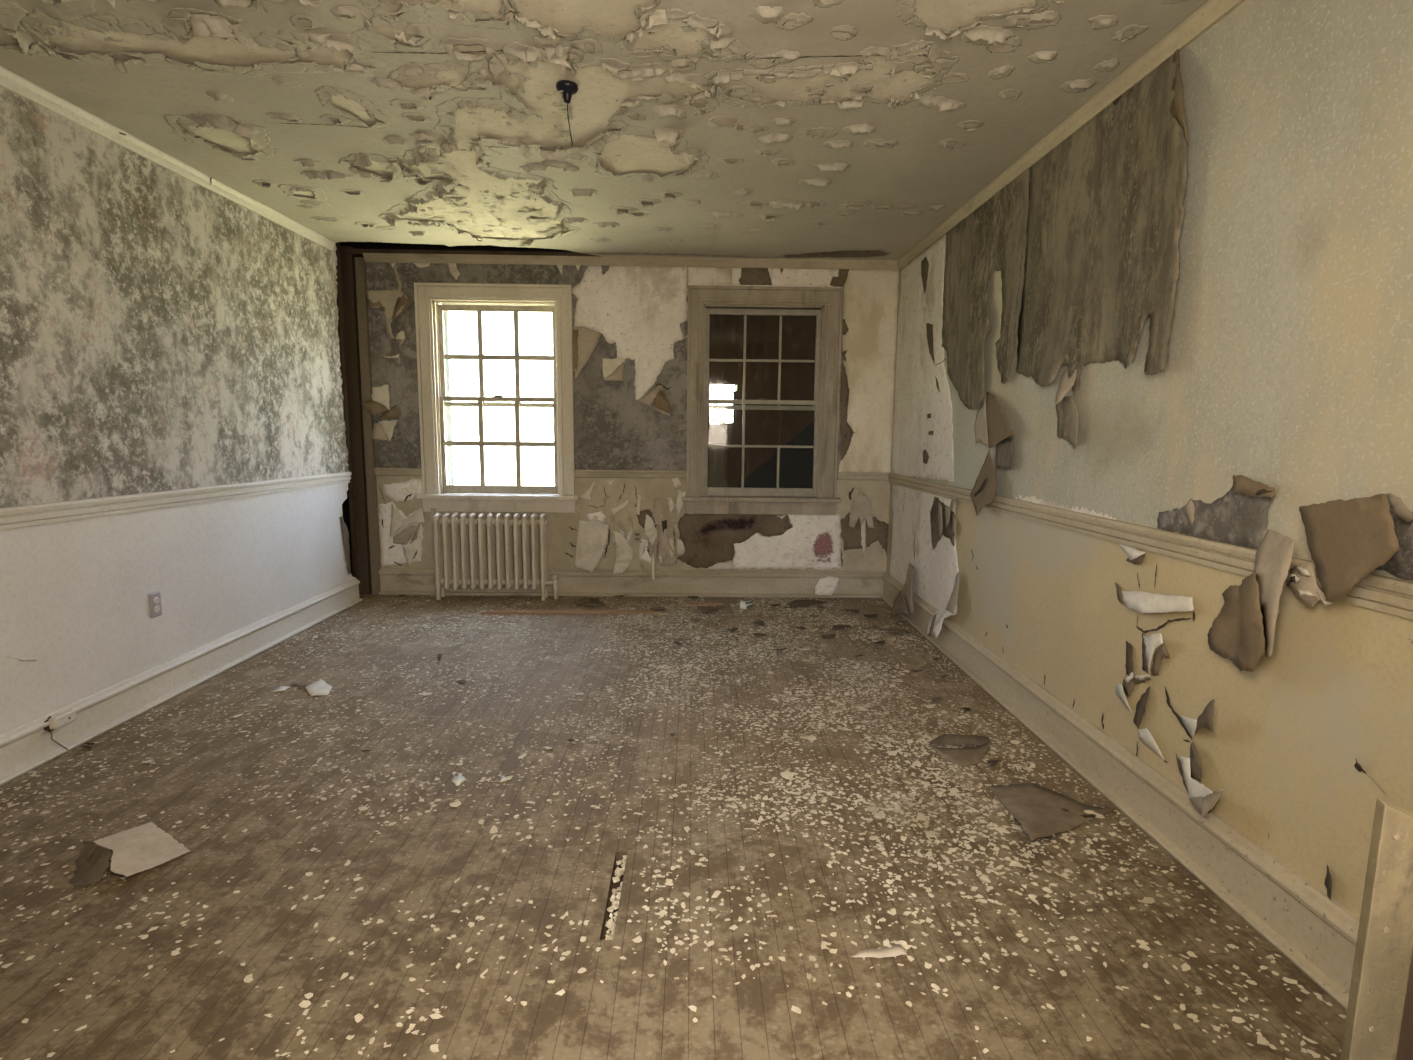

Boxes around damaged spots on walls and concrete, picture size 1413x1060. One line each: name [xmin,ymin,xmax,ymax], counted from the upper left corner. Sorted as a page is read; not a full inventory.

peeling [1059,15,1150,93]
flaking render [557,237,959,611]
flaking render [379,478,425,567]
peeling [1286,563,1332,607]